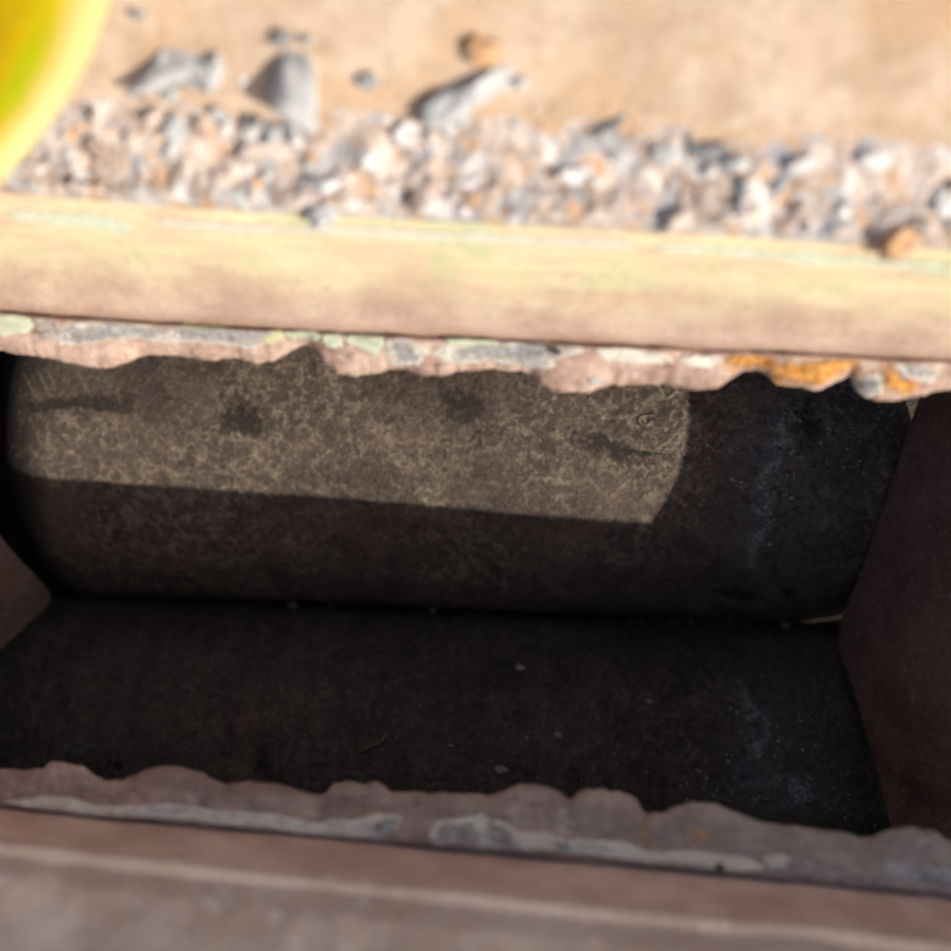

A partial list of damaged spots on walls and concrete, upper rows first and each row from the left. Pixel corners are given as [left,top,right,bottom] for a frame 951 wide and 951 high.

peeling [0,312,725,369]
corrosion [723,356,868,387]
peeling [852,371,885,398]
corrosion [882,364,921,396]
peeling [891,361,942,383]
peeling [4,796,401,839]
peeling [429,813,951,887]